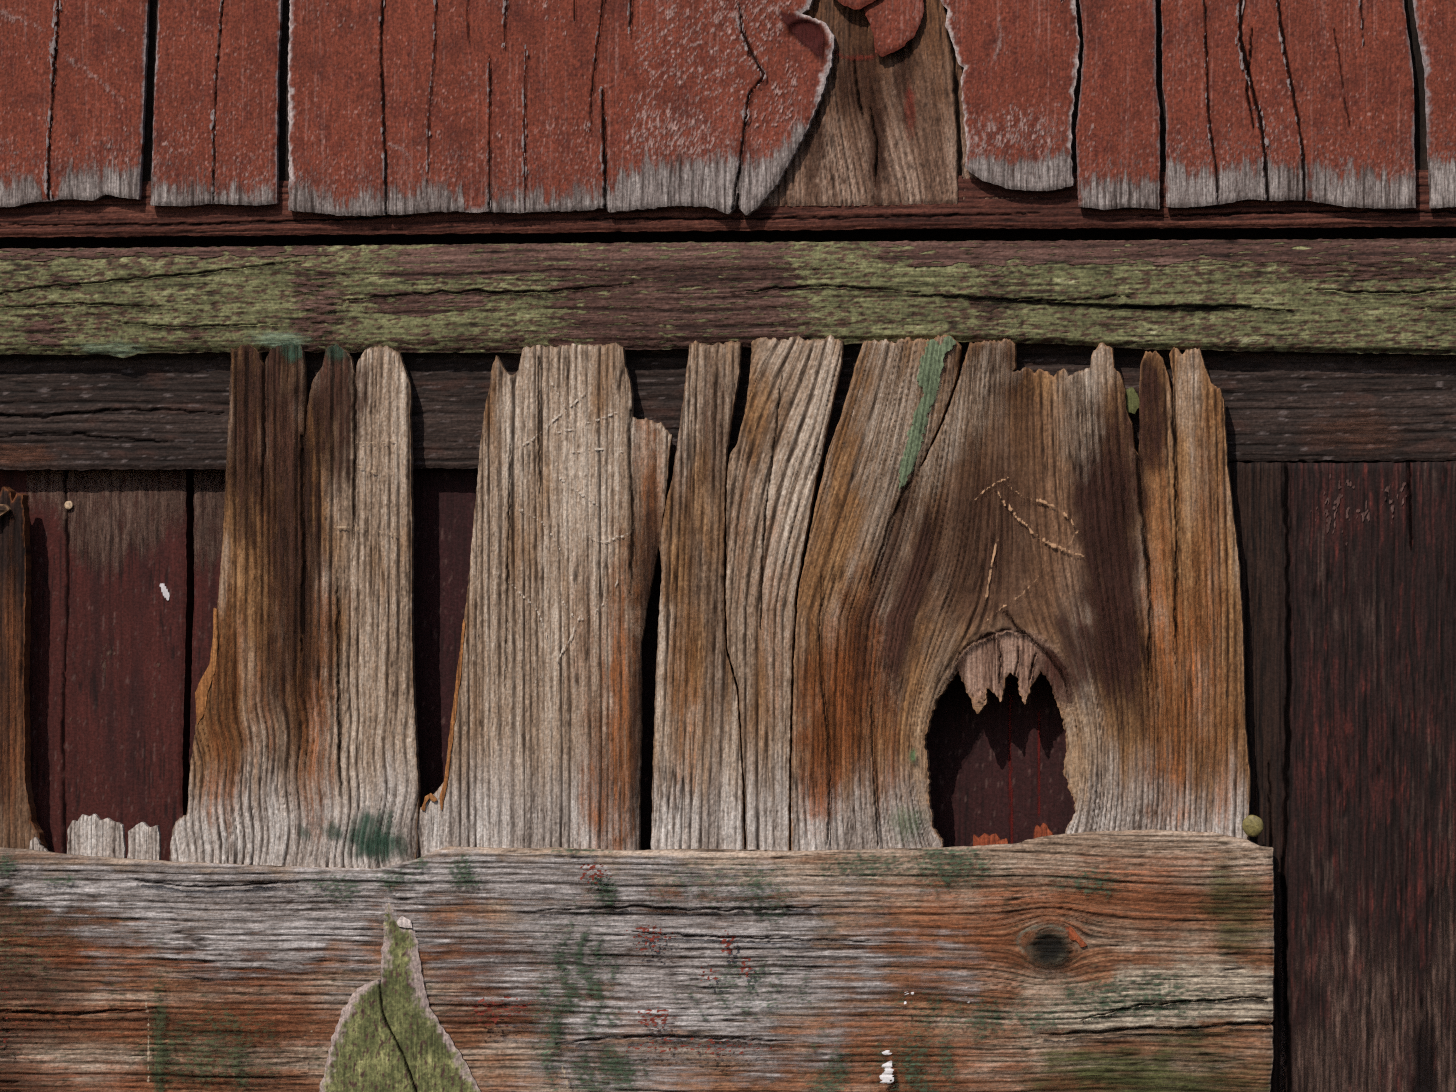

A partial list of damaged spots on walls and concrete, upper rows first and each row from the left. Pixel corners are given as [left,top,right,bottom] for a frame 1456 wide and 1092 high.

peeling [838,0,924,57]
peeling [0,0,806,216]
crack [574,0,1040,220]
peeling [965,104,1456,210]
crack [1141,0,1456,218]
leakage [85,343,142,356]
crack [379,978,417,1092]
peeling [879,1050,894,1084]